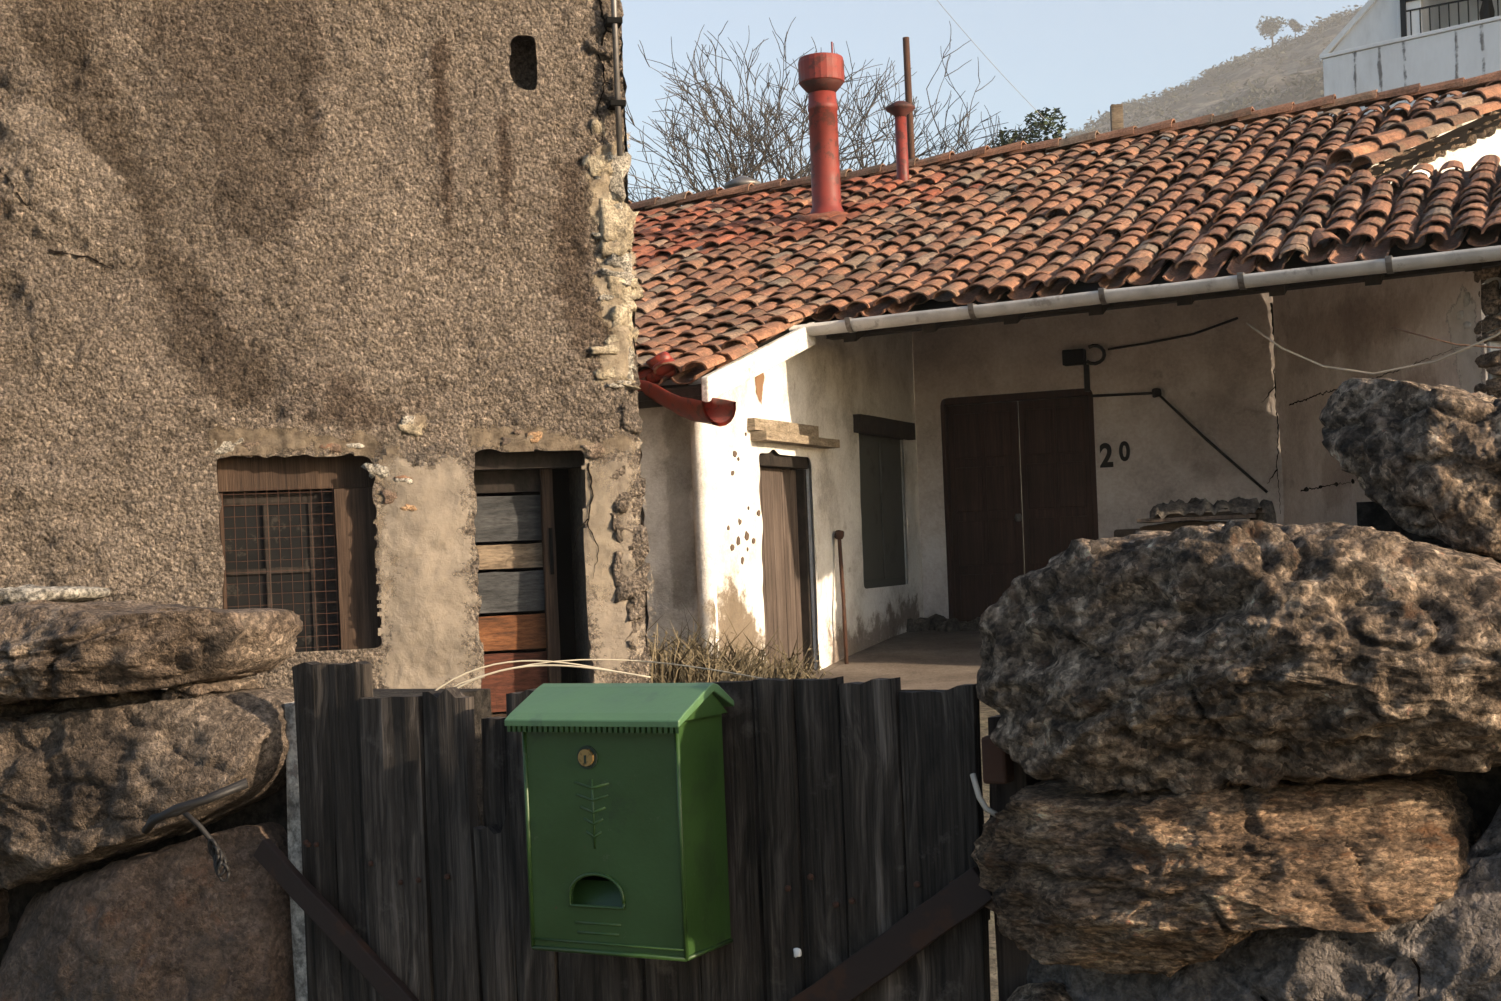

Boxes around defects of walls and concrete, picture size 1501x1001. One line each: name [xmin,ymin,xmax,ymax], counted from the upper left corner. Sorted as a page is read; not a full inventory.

crack [0,169,32,211]
crack [49,249,113,269]
flaking render [581,118,677,392]
crack [1411,958,1421,1001]